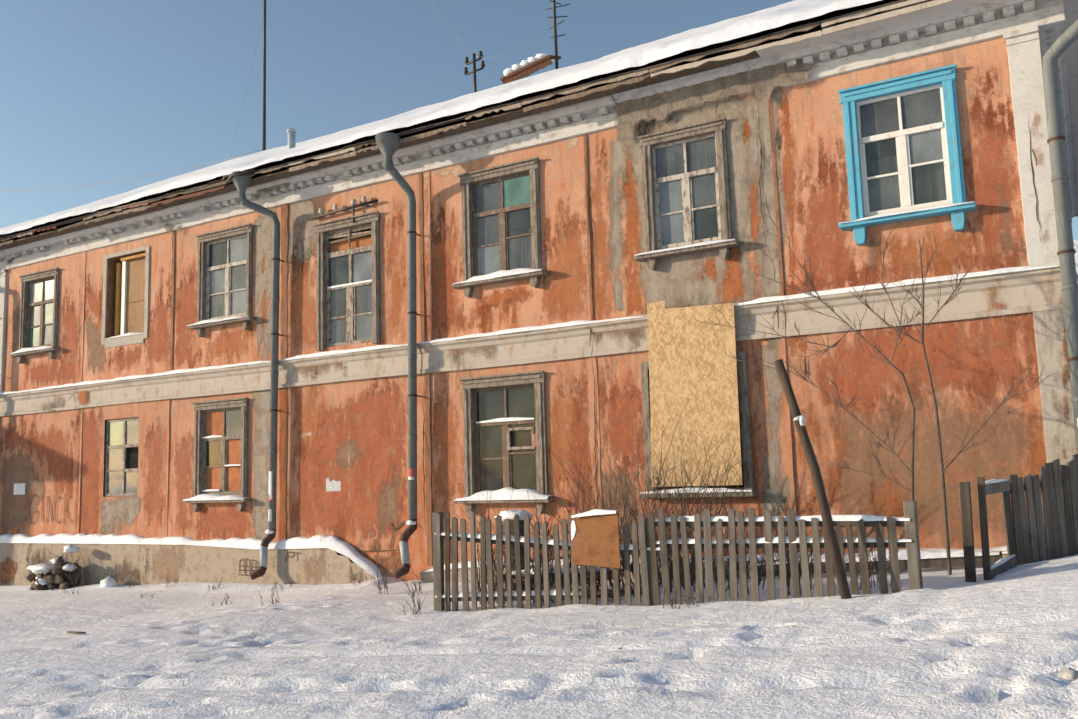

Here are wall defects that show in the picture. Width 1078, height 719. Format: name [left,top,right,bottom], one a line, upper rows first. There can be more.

spalling [108,203,275,371]
peeling [287,188,317,358]
peeling [423,165,476,337]
crack [757,102,766,245]
spalling [543,59,1023,320]
spalling [0,390,270,540]
peeling [291,377,405,574]
spalling [747,335,813,536]
peeling [798,313,1039,460]
flaking render [0,557,17,585]